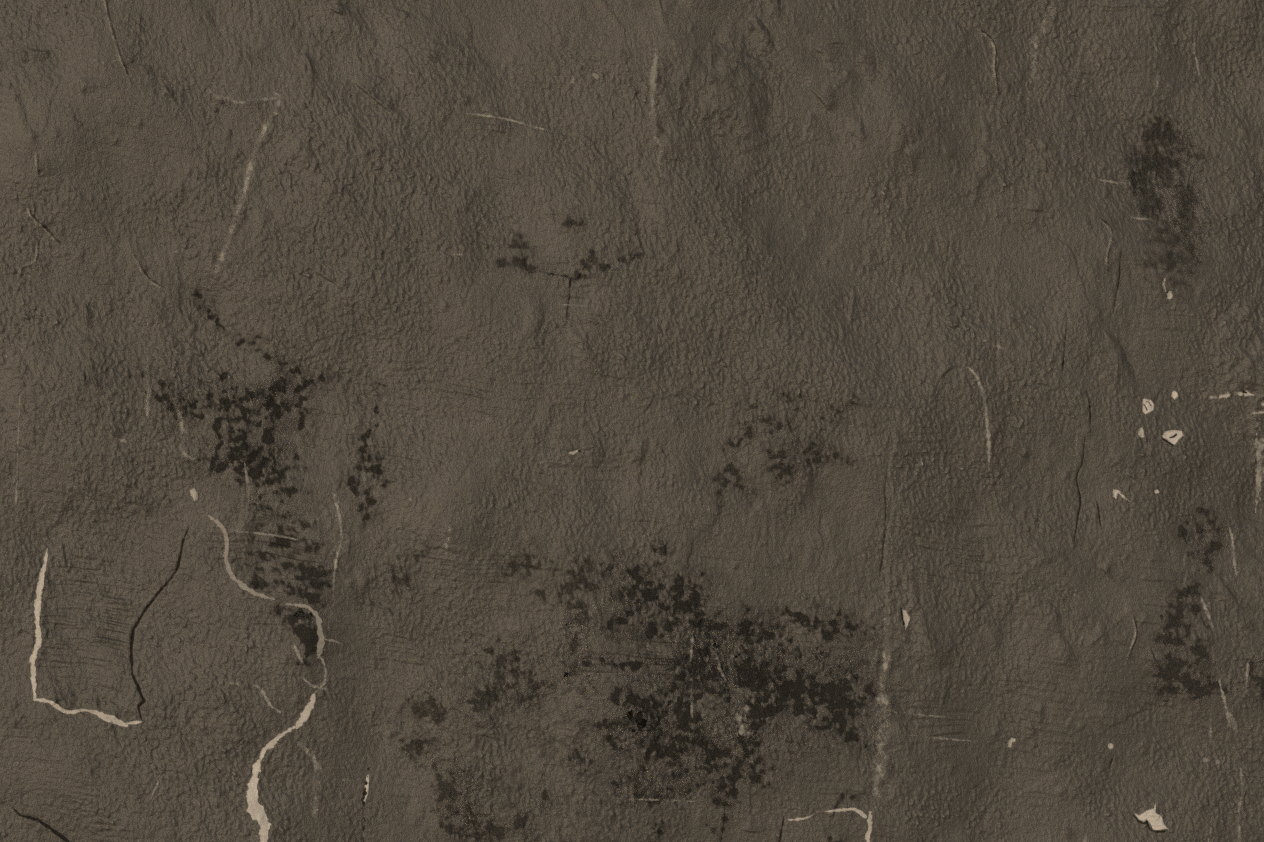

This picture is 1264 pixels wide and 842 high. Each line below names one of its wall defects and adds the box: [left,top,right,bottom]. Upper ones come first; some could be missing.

peeling [1138,399,1154,438]
peeling [1162,430,1183,446]
spalling [1209,390,1264,513]
damp [505,553,554,576]
crack [130,529,188,720]
damp [400,696,447,755]
damp [467,639,553,712]
damp [535,545,897,834]
damp [433,763,527,842]
peeling [1133,804,1168,833]